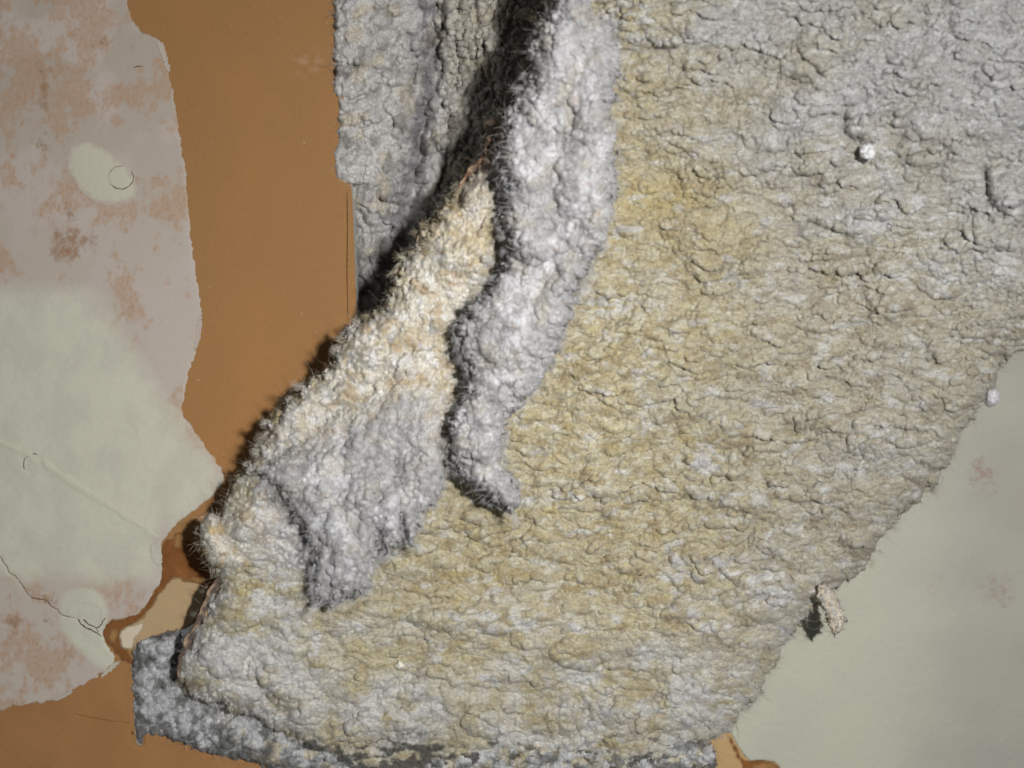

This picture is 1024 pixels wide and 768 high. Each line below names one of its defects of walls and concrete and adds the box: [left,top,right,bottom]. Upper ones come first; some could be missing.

peeling [127,0,357,522]
peeling [150,542,163,565]
damp [103,505,216,663]
peeling [0,578,265,768]
peeling [709,733,749,768]